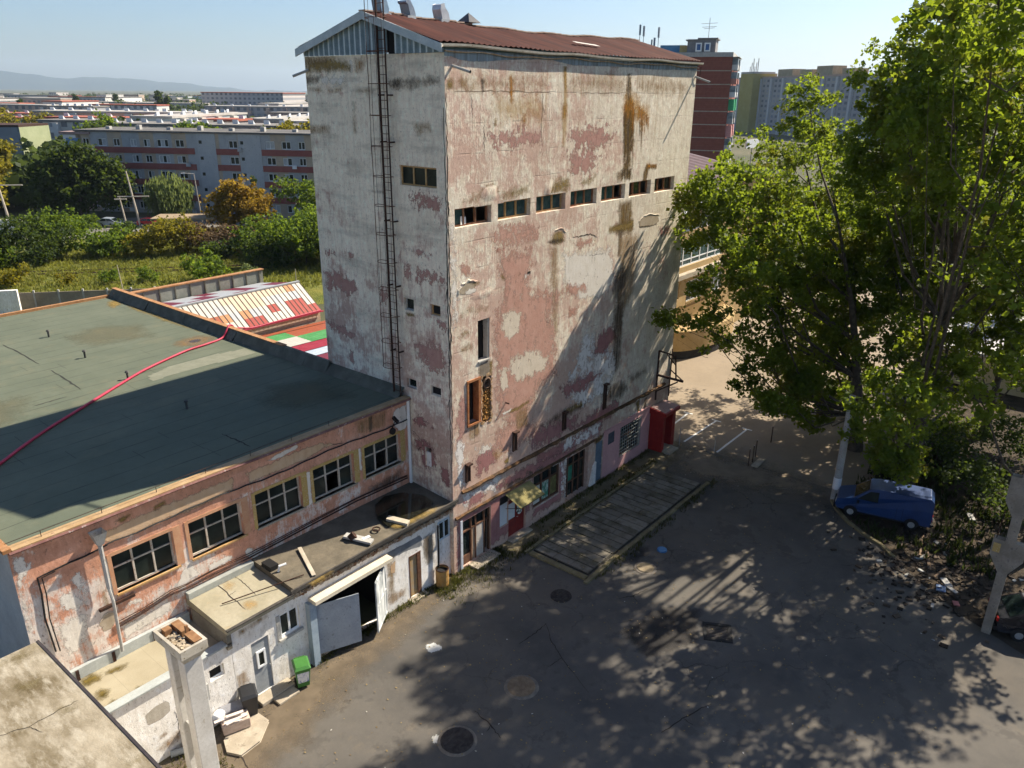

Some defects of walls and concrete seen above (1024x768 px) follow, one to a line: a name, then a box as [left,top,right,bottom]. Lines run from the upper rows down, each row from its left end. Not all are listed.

peeling [487,122,543,159]
peeling [563,117,617,180]
rust [618,77,649,178]
peeling [408,189,443,212]
spalling [639,213,671,236]
peeling [324,270,357,297]
water stain [613,235,637,370]
peeling [393,221,620,566]
peeling [271,445,298,460]
peeling [13,557,32,631]
peeling [57,572,88,656]